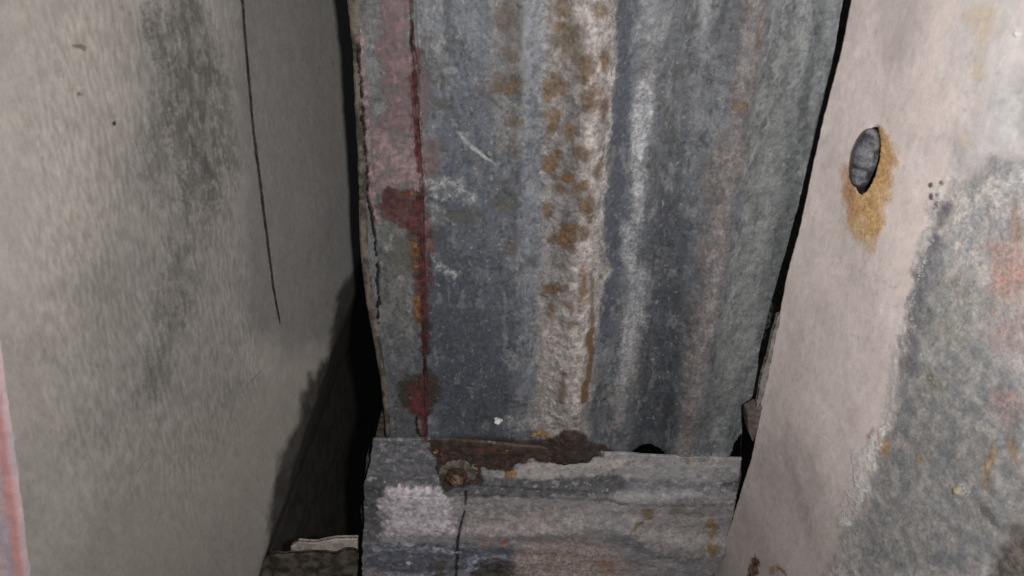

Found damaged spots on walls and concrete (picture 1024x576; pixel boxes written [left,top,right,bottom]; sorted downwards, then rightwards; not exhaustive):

water stain [178,0,230,181]
crack [241,0,280,322]
corrosion [347,0,555,492]
corrosion [544,270,595,403]
corrosion [543,1,610,249]
corrosion [844,134,893,244]
crack [455,484,584,576]